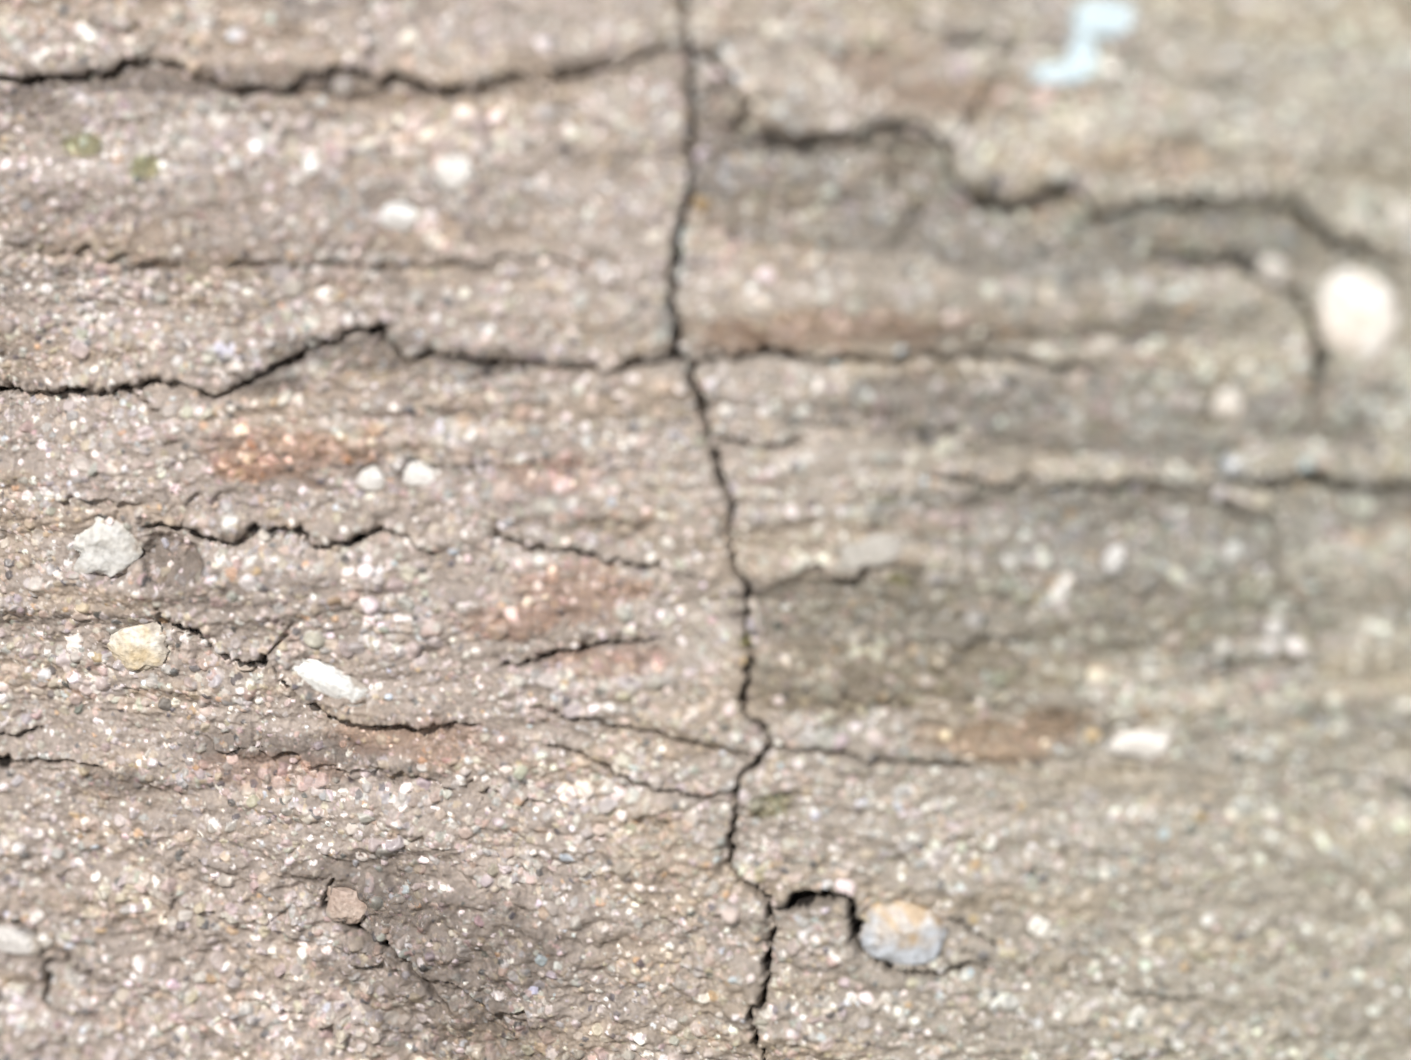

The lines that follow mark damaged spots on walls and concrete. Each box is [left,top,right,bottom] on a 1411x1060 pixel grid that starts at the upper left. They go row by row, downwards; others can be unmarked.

crack [791,121,1218,220]
crack [0,0,1089,857]
crack [931,470,1409,521]
crack [46,955,79,1010]
crack [749,885,936,1060]